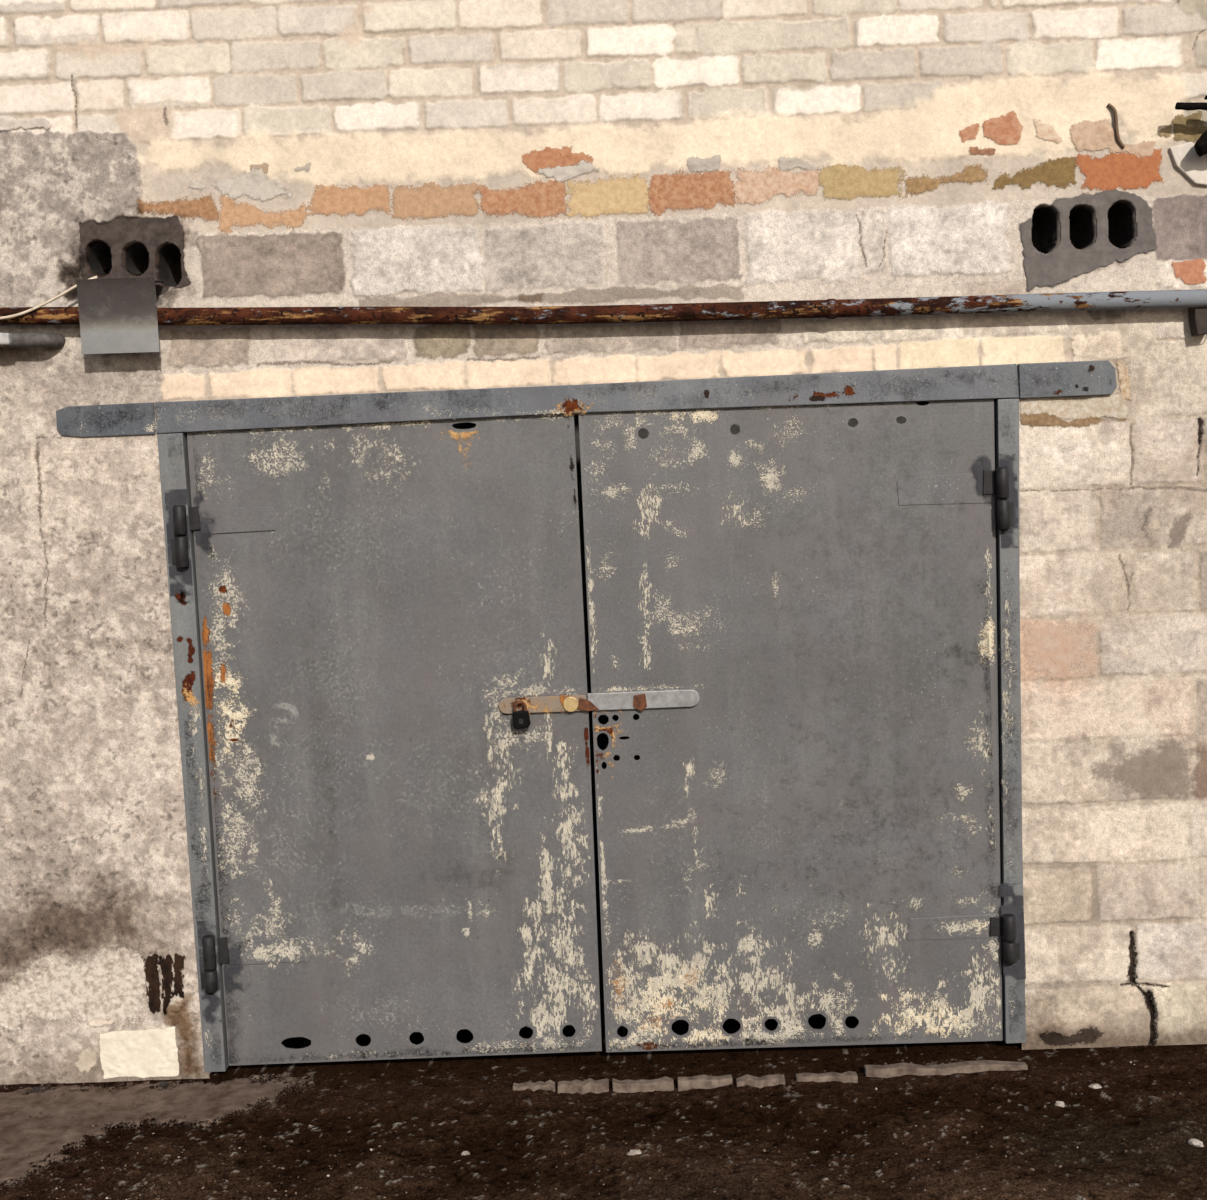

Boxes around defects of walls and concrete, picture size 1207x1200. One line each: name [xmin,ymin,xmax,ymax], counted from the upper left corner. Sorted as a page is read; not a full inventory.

peeling [136,110,1207,234]
rust [789,385,854,401]
crack [1019,418,1206,492]
rust [219,585,231,616]
rust [177,618,238,774]
rust [501,693,569,712]
rust [584,711,621,773]
peeling [443,633,1015,1055]
crack [1120,931,1169,1045]